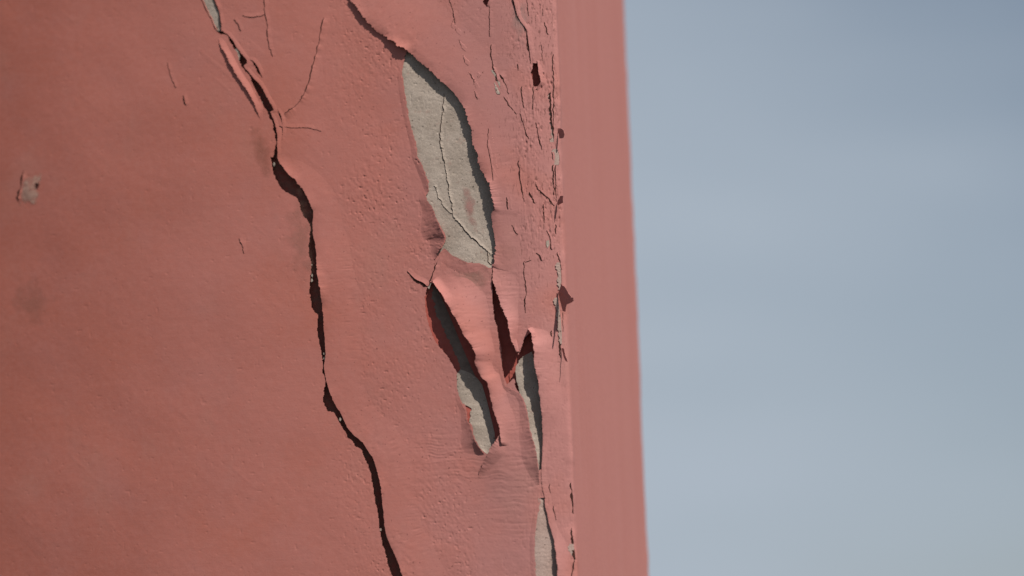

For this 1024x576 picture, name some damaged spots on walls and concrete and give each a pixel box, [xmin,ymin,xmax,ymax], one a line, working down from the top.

crack [202,0,447,576]
peeling [350,0,574,576]
crack [449,0,563,313]